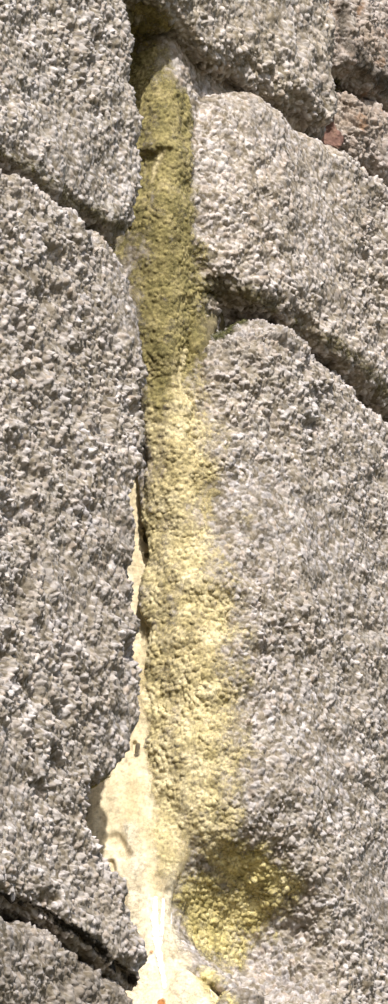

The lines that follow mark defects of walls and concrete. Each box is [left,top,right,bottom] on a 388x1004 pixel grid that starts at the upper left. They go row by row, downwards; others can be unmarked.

water stain [151,150,165,183]
water stain [173,89,197,268]
water stain [177,346,187,406]
water stain [145,402,160,464]
crack [0,892,138,984]